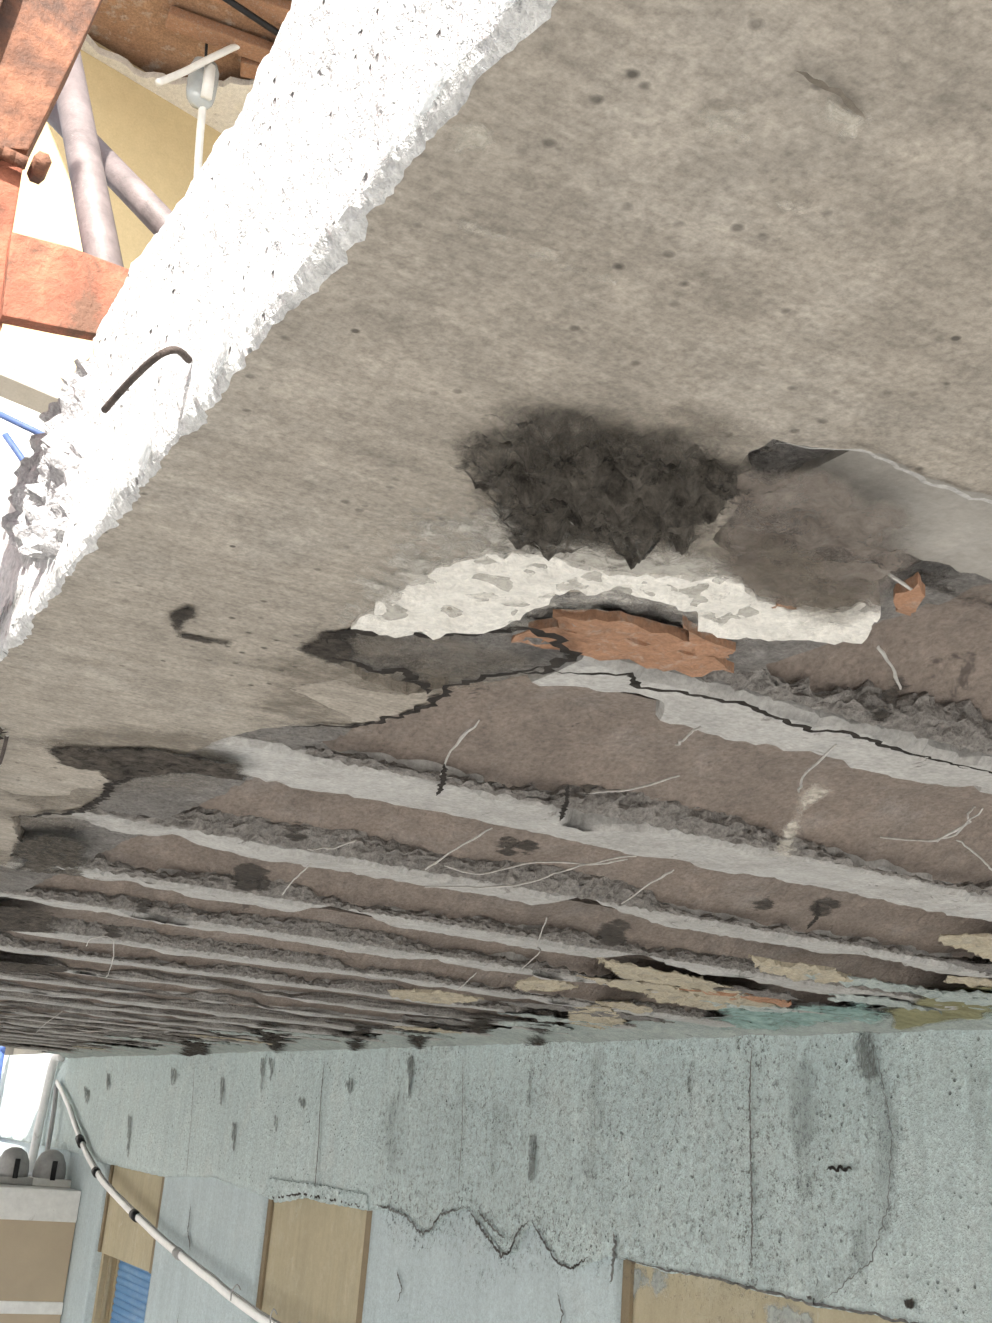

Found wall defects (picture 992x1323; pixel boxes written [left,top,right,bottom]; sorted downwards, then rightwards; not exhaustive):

spalling [101,346,192,413]
spalling [1,358,93,582]
damp [456,411,992,609]
spalling [342,510,925,684]
spalling [50,746,246,781]
crack [436,764,448,796]
crack [559,785,570,821]
crack [293,627,992,774]
flaking render [514,976,579,992]
peeling [596,954,992,1081]
flaking render [938,933,992,962]
crack [377,1043,918,1323]